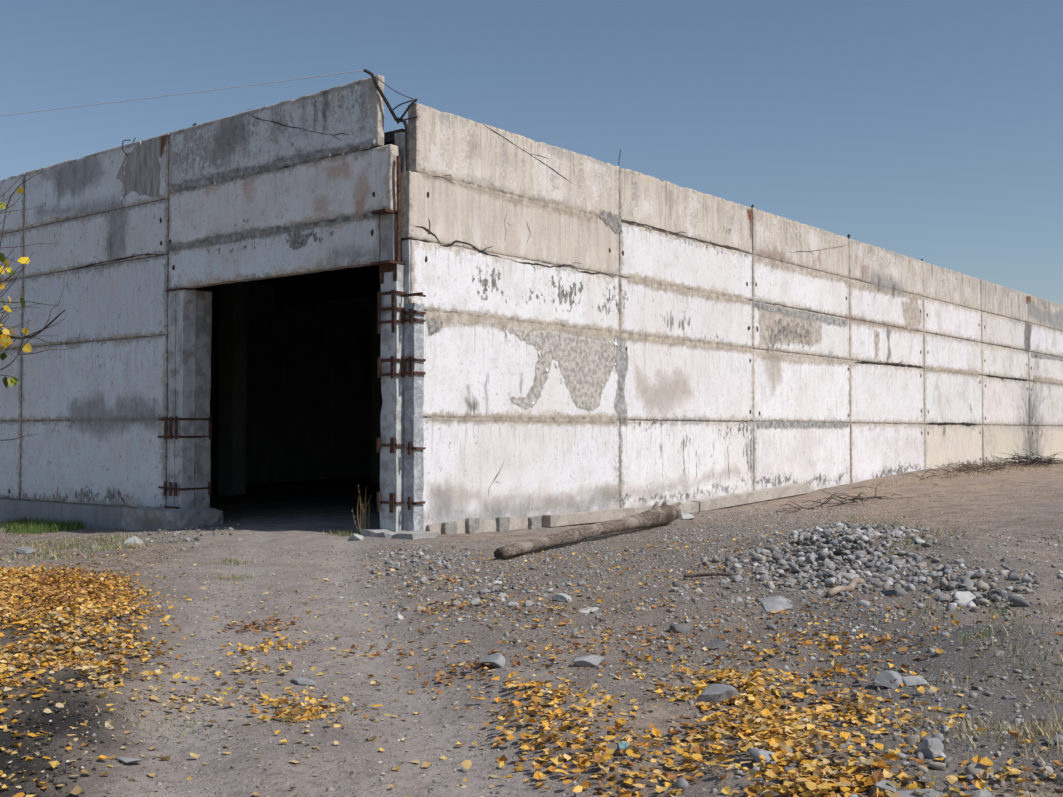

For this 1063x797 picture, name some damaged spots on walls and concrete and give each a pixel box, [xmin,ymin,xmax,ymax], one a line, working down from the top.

crack [482,123,569,181]
spalling [423,172,623,233]
crack [414,214,615,277]
peeling [472,264,508,302]
peeling [735,252,922,330]
flaking render [426,275,857,429]